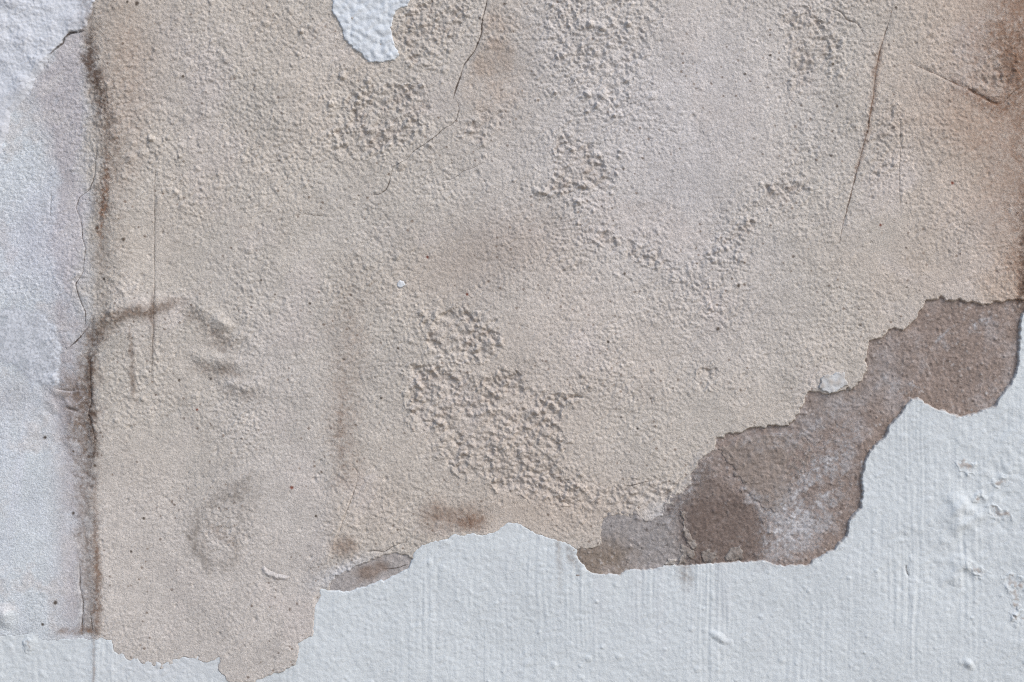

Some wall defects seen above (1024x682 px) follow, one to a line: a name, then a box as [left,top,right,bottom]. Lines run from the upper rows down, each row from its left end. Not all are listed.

leakage [83,52,110,129]
spalling [324,0,475,168]
leakage [88,303,169,337]
leakage [73,357,98,488]
peeling [400,297,1024,576]
peeling [329,553,412,592]
peeling [964,558,1024,626]